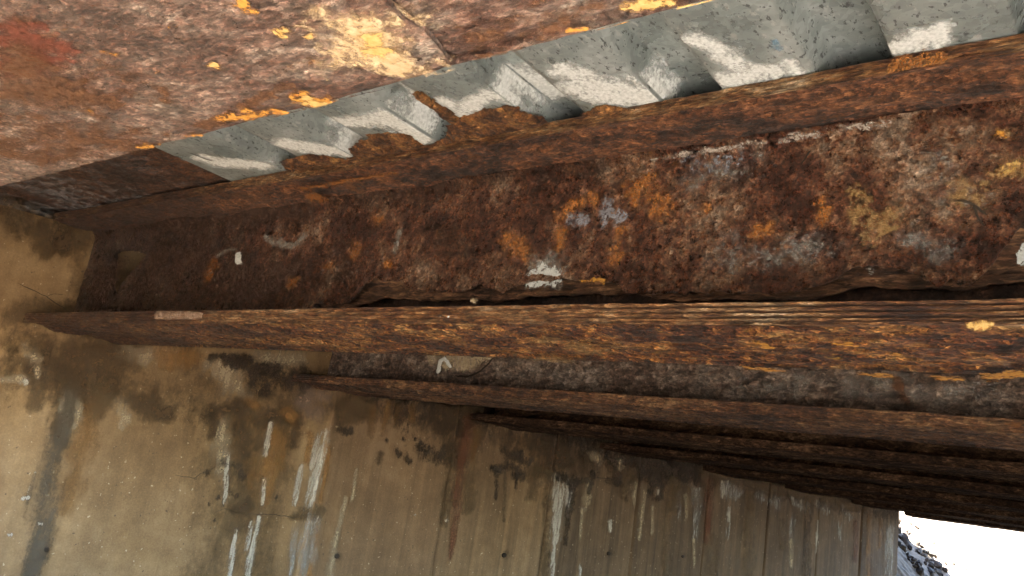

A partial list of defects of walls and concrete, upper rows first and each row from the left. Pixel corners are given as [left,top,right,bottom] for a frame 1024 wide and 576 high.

corrosion [0,16,170,167]
corrosion [186,0,712,172]
corrosion [948,159,1024,212]
damp [0,195,94,261]
corrosion [86,172,398,312]
corrosion [553,190,600,252]
corrosion [845,189,904,249]
corrosion [155,311,202,319]
corrosion [966,320,994,331]
corrosion [980,370,1024,382]
damp [5,335,176,576]
damp [173,350,904,576]